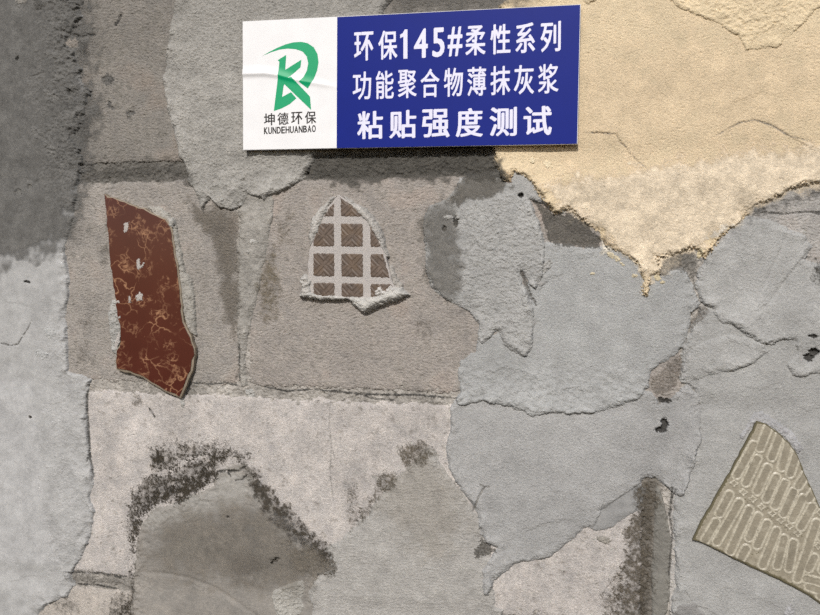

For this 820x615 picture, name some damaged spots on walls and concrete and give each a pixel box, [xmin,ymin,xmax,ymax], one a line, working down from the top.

spalling [532,197,601,248]
spalling [659,248,704,286]
spalling [474,539,497,559]